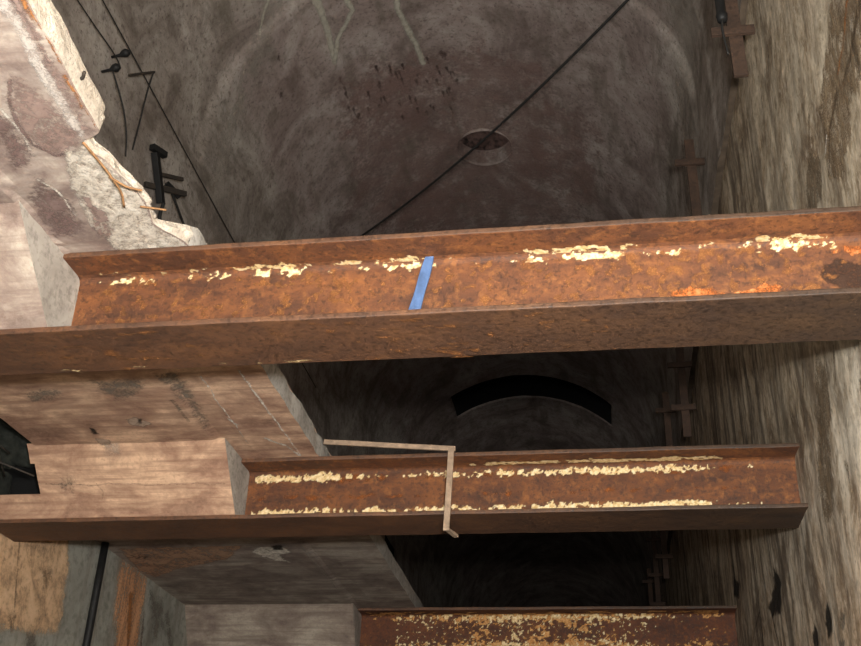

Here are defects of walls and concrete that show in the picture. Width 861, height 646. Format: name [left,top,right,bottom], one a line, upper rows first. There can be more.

peeling [743,233,836,253]
peeling [511,244,644,264]
peeling [99,272,165,285]
peeling [188,262,312,281]
peeling [328,255,436,273]
corrosion [821,246,861,288]
corrosion [672,283,782,296]
peeling [403,455,723,478]
peeling [255,471,387,484]
peeling [251,499,712,515]